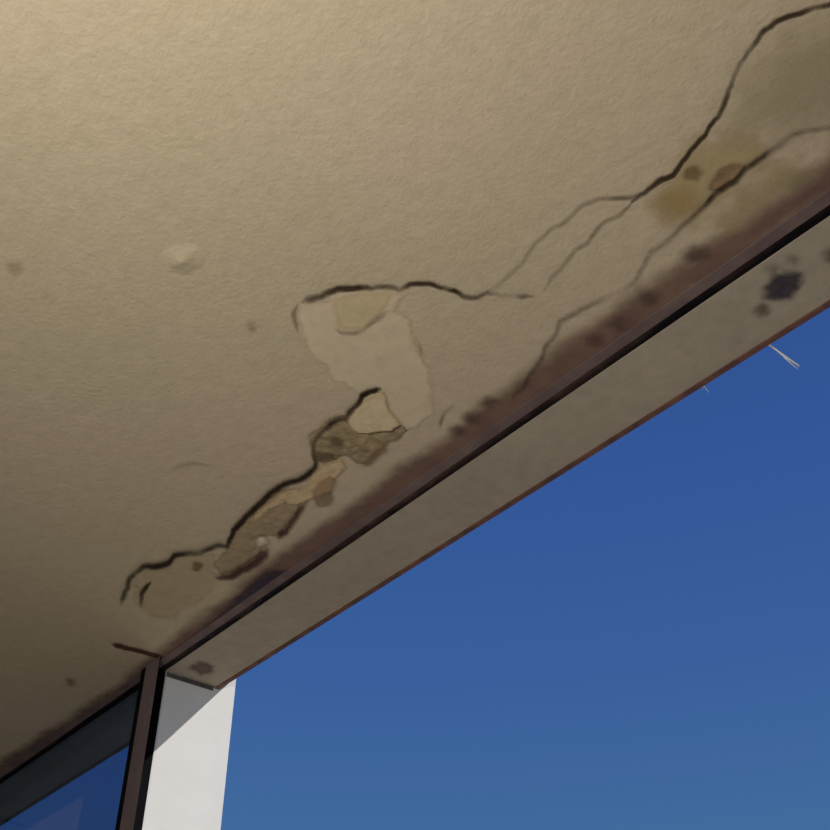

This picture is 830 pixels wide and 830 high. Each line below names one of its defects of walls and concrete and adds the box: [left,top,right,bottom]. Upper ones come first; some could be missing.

crack [744,2,830,58]
crack [617,86,731,201]
water stain [655,140,758,222]
crack [691,151,769,218]
crack [307,281,484,301]
peeling [136,290,434,619]
crack [325,387,381,430]
water stain [128,164,830,681]
crack [121,457,318,601]